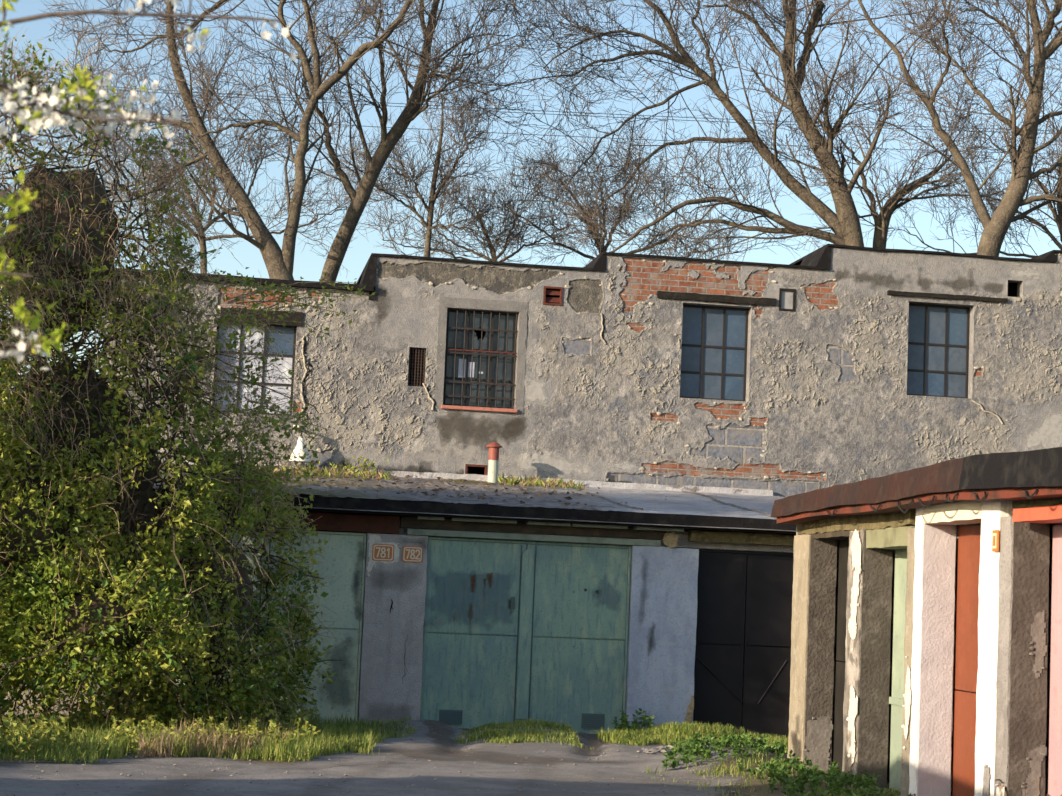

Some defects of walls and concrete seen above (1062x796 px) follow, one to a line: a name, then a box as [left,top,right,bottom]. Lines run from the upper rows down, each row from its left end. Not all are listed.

flaking render [618,258,777,332]
flaking render [801,279,841,310]
flaking render [695,402,768,428]
flaking render [639,441,826,481]
peeling [848,529,861,651]